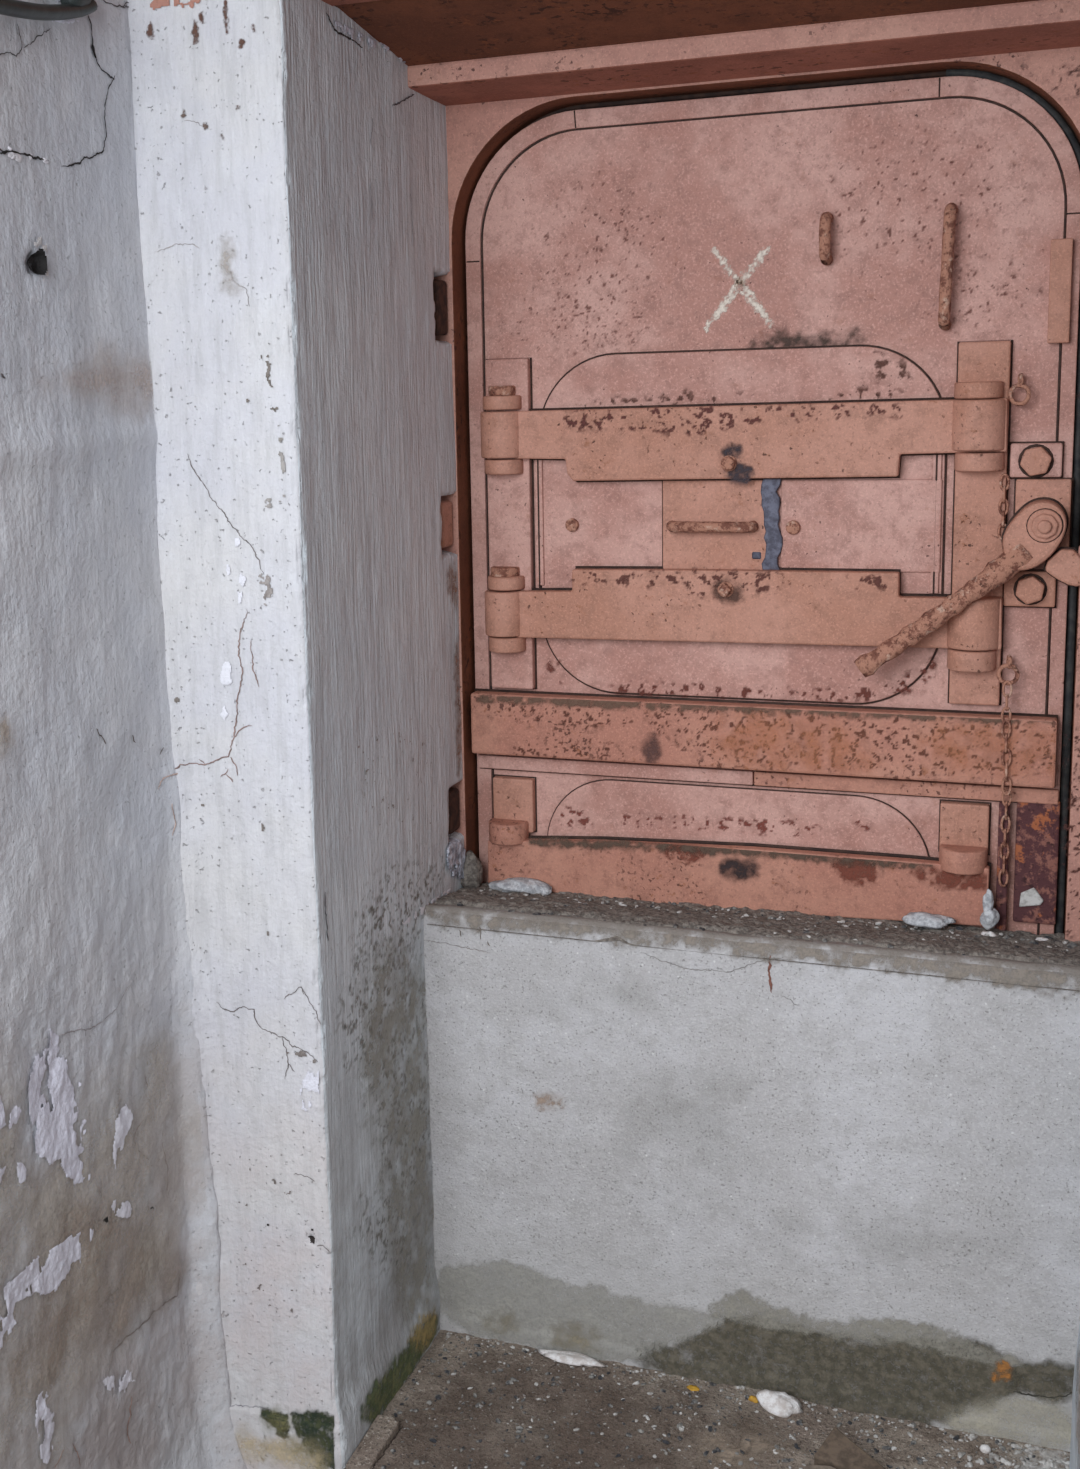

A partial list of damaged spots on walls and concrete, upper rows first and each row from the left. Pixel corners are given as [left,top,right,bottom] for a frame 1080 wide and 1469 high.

crack [0,0,129,167]
crack [188,455,264,574]
crack [97,614,259,836]
corrosion [509,661,1052,776]
corrosion [623,815,814,836]
corrosion [911,867,987,890]
crack [217,987,321,1075]
peeling [0,1028,90,1184]
peeling [112,1104,133,1169]
damp [344,867,1022,1366]
peeling [0,1229,94,1349]
peeling [35,1391,54,1464]